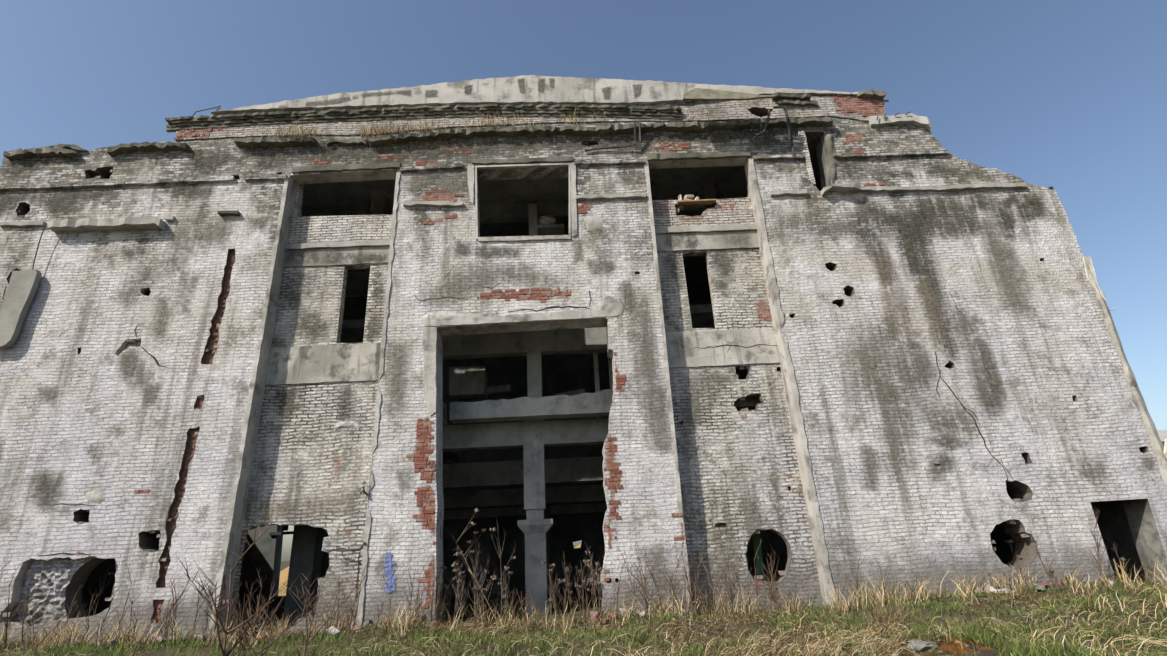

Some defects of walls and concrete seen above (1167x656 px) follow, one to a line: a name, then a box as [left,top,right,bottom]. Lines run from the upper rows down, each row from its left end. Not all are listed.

flaking render [830,94,889,117]
water stain [118,249,146,302]
water stain [120,352,159,403]
water stain [156,300,168,335]
water stain [172,221,230,306]
flaking render [477,287,571,303]
water stain [779,192,1043,491]
crack [935,353,1013,481]
flaking render [406,418,436,608]
flaking render [604,437,623,549]
hole [990,519,1037,569]
spalling [0,551,118,626]